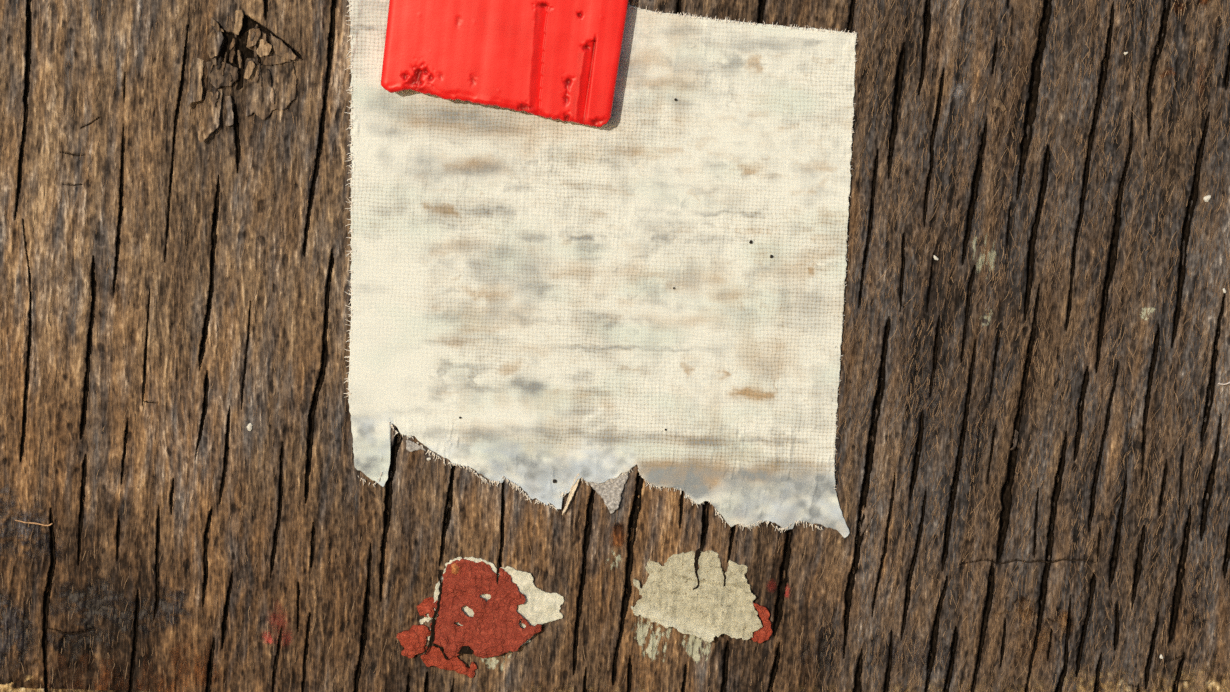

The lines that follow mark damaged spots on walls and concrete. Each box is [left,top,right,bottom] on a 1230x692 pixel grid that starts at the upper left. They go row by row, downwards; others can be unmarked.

crack [15,0,31,462]
crack [43,117,124,692]
crack [121,289,155,484]
crack [270,0,336,692]
peeling [396,557,564,678]
peeling [631,542,772,643]
crack [844,0,1230,692]